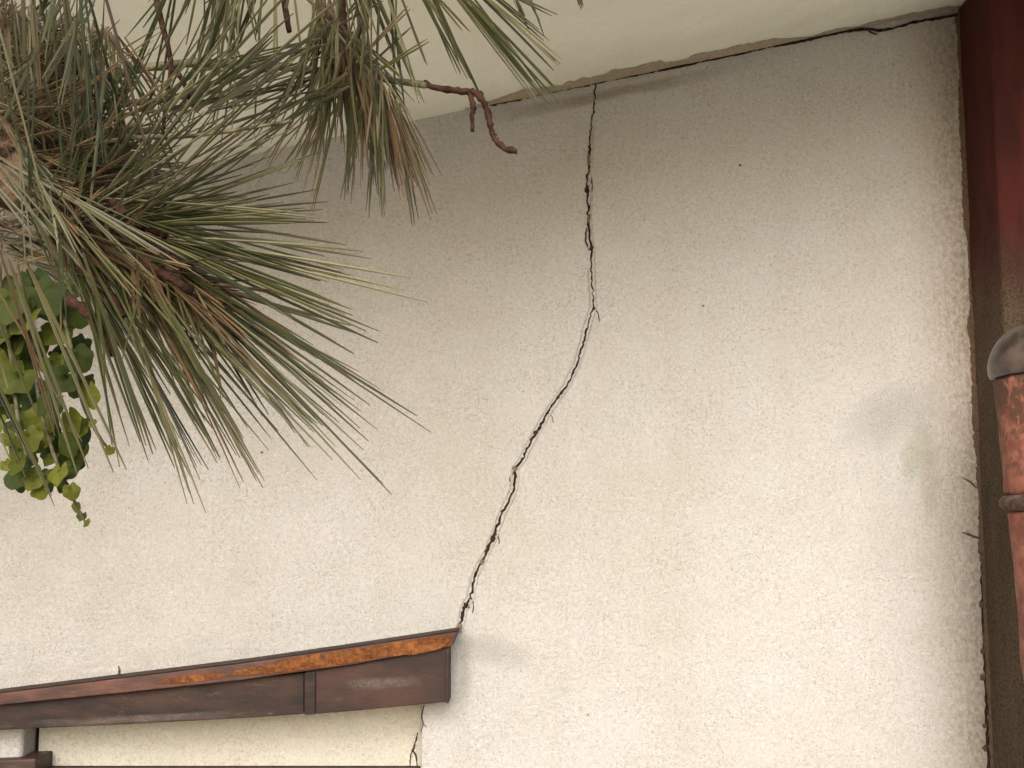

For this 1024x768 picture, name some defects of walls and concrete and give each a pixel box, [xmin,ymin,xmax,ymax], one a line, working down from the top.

crack [455,14,958,634]
corrosion [155,635,452,683]